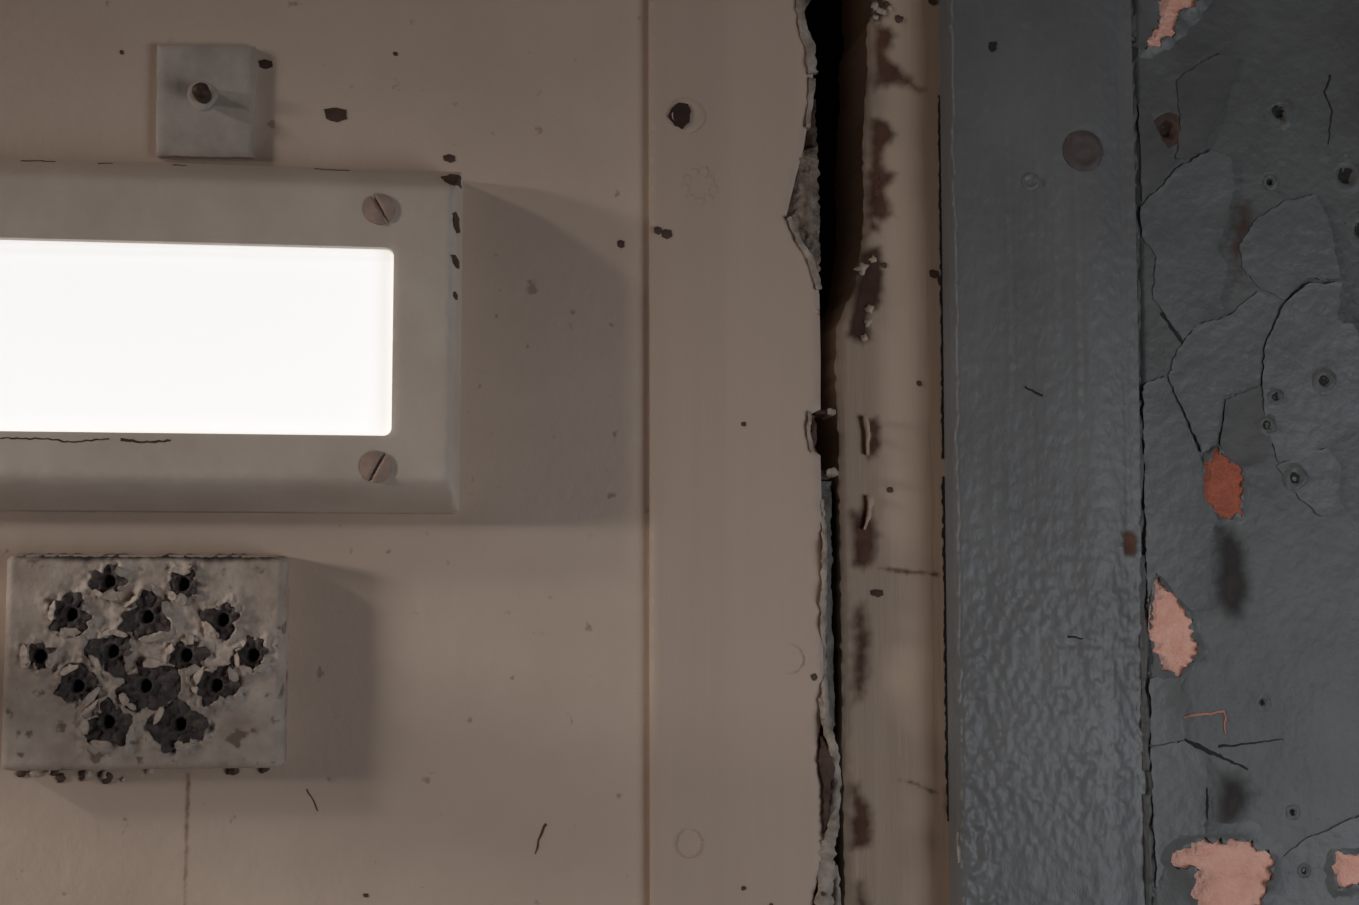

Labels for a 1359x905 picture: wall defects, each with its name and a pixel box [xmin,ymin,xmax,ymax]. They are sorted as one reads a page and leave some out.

peeling [1132,0,1213,60]
crack [1323,75,1333,145]
crack [1160,312,1183,344]
peeling [1137,104,1359,905]
crack [1181,738,1284,770]